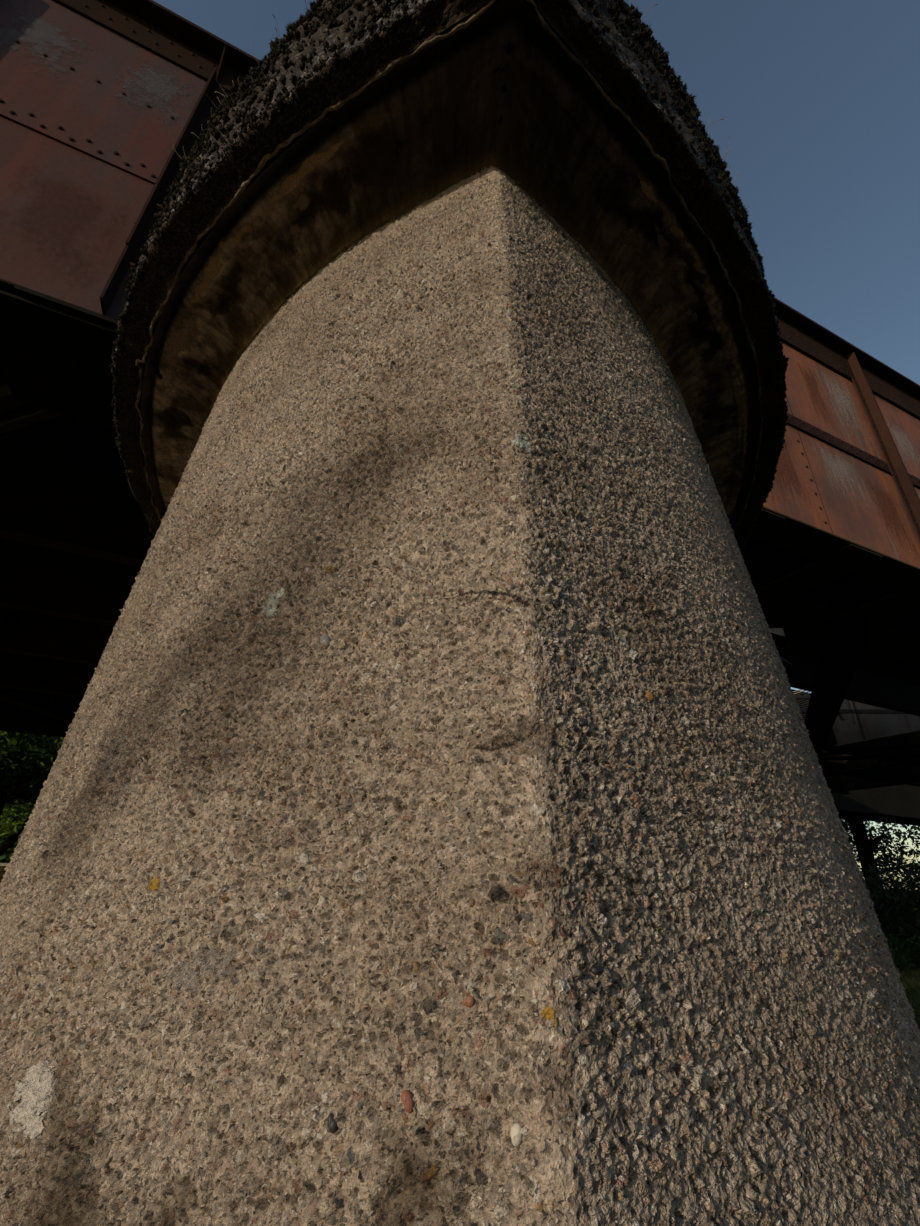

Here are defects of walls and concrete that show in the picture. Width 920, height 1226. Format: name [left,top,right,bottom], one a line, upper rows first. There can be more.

rust [775,443,806,496]